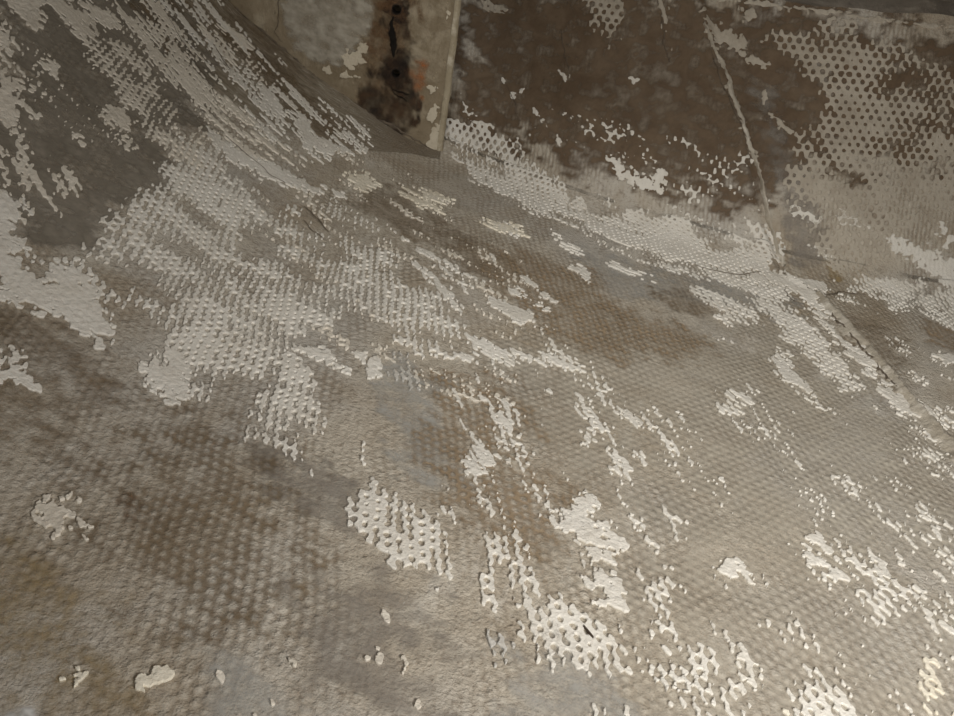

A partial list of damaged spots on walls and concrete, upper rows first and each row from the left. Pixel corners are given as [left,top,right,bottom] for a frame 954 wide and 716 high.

rust [358,0,426,135]
leakage [447,0,954,217]
peeling [0,0,648,481]
crack [819,289,897,386]
peeling [31,491,94,542]
peeling [344,476,453,580]
peeling [479,491,633,679]
peeling [635,564,752,716]
peeling [717,556,754,585]
peeling [782,663,867,716]
peeling [803,503,918,628]
peeling [917,657,945,716]